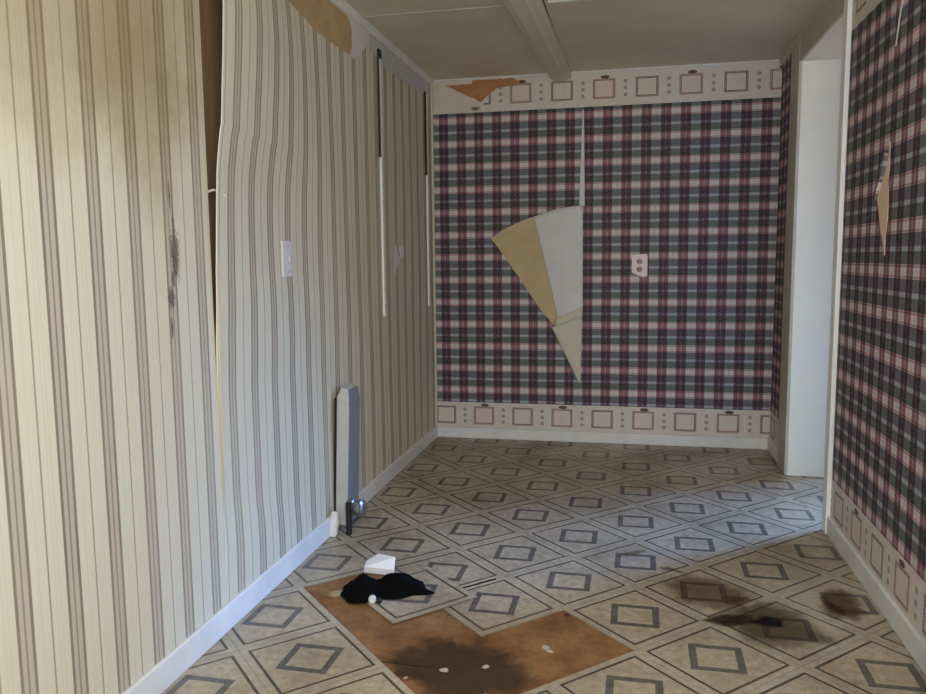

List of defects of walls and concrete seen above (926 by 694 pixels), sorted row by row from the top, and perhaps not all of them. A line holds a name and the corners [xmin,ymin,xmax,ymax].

peeling [289,0,520,114]
damp [169,217,179,307]
peeling [305,573,632,694]